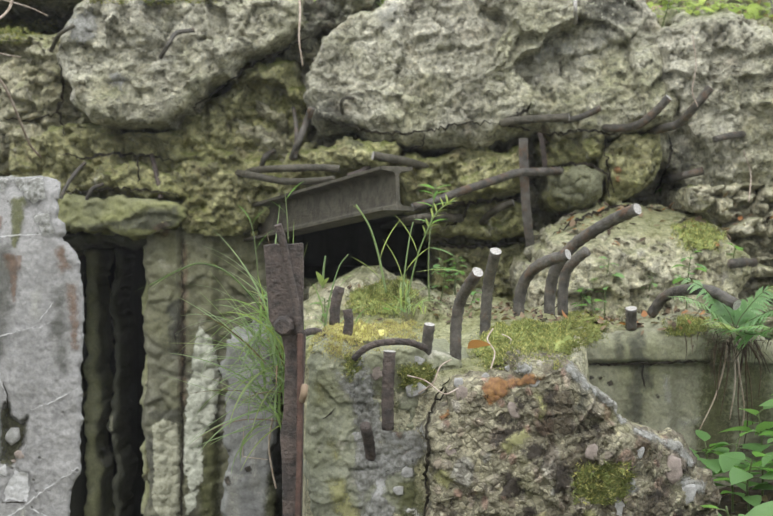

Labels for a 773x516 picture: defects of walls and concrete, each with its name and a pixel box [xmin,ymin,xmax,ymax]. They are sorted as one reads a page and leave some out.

crack [4,58,181,196]
crack [327,103,673,235]
spalling [0,402,30,502]
crack [422,377,450,516]
corrosion [482,374,543,405]